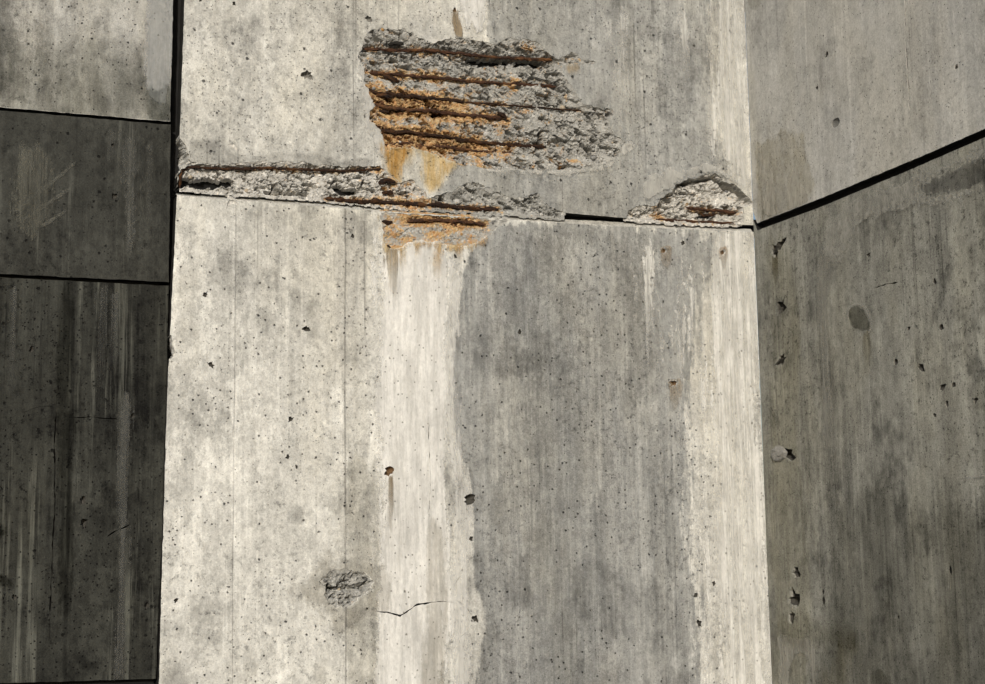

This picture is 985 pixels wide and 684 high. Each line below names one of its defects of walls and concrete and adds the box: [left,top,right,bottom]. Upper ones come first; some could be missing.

spalling [358,28,623,171]
spalling [176,140,566,249]
spalling [623,147,808,228]
corrosion [383,243,425,268]
crack [377,601,445,617]